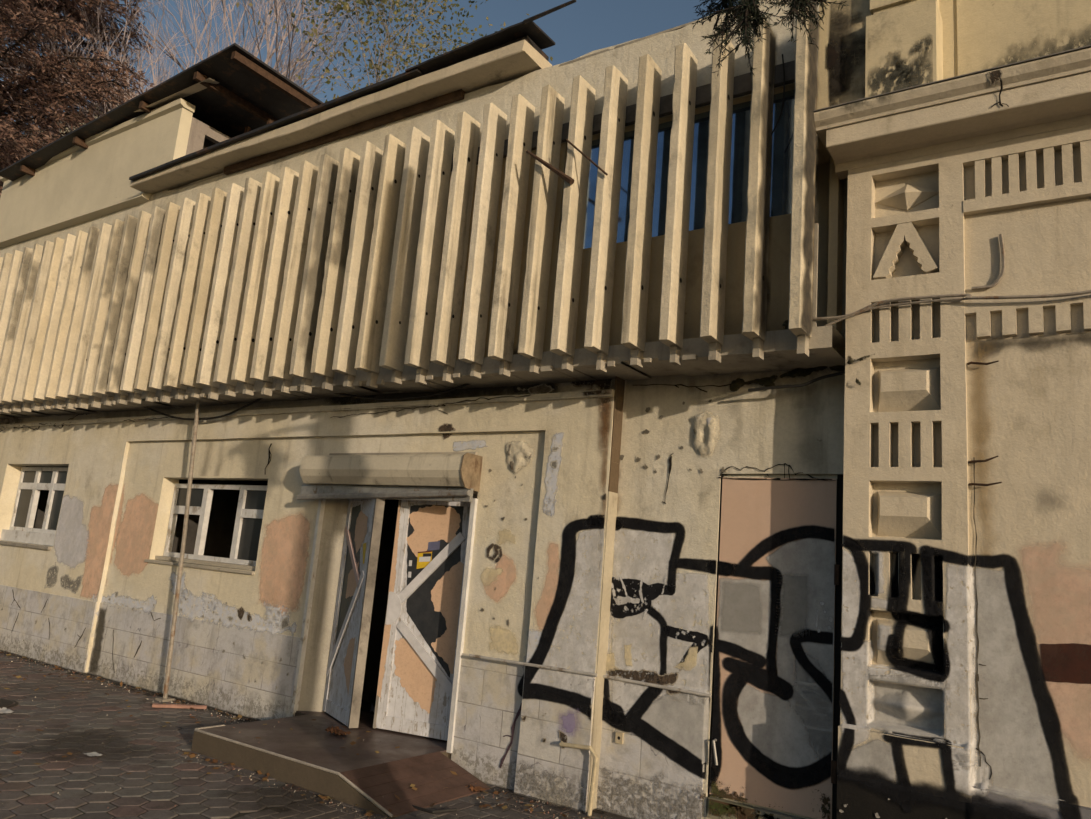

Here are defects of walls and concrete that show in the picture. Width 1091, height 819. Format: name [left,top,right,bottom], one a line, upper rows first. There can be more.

peeling [543,433,564,516]
crack [662,453,674,504]
peeling [169,572,297,634]